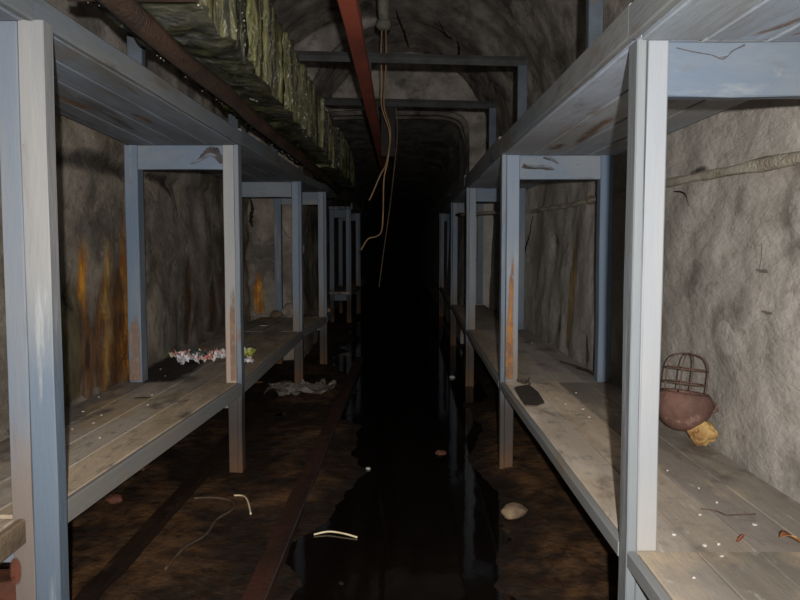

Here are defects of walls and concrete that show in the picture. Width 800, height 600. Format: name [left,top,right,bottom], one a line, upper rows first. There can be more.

corrosion [78,240,140,398]
corrosion [506,265,514,379]